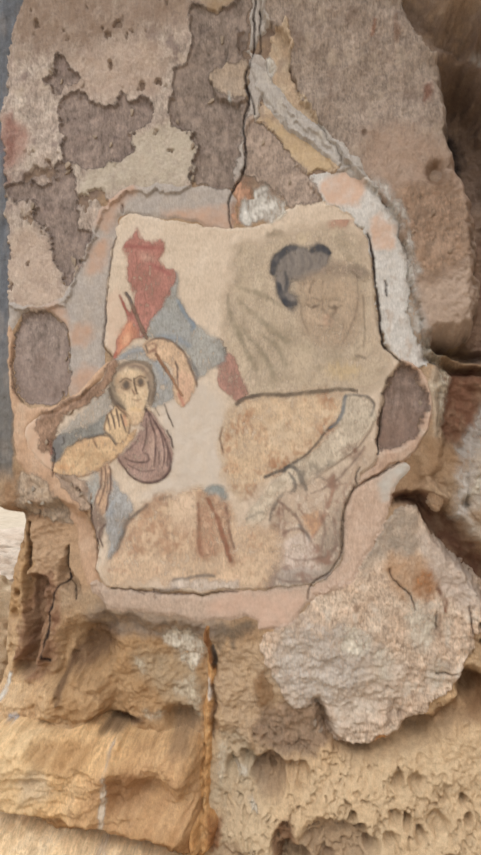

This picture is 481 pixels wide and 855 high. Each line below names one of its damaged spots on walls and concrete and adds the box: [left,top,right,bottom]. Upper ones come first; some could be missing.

flaking render [4,52,154,286]
flaking render [168,0,321,209]
crack [228,11,262,226]
flaking render [13,311,72,406]
crack [367,234,401,362]
flaking render [376,363,431,451]
crack [340,462,398,556]
crack [40,545,77,661]